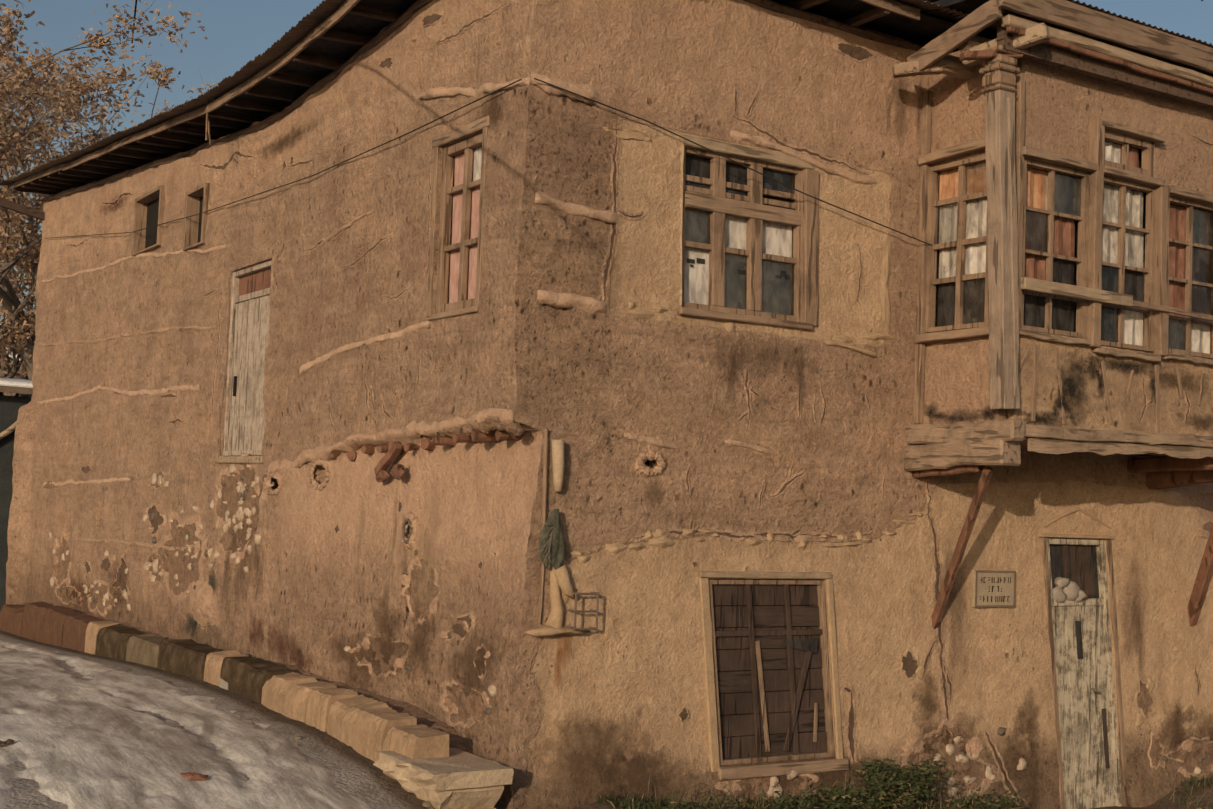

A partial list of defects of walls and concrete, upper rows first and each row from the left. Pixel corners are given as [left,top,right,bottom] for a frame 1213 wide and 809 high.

crack [422,1,510,56]
crack [200,149,255,172]
leakage [1027,358,1193,425]
crack [770,462,806,499]
spalling [48,452,283,618]
crack [635,518,873,543]
spalling [398,500,476,648]
spalling [344,633,413,681]
spalling [439,643,496,729]
spalling [1135,675,1213,778]